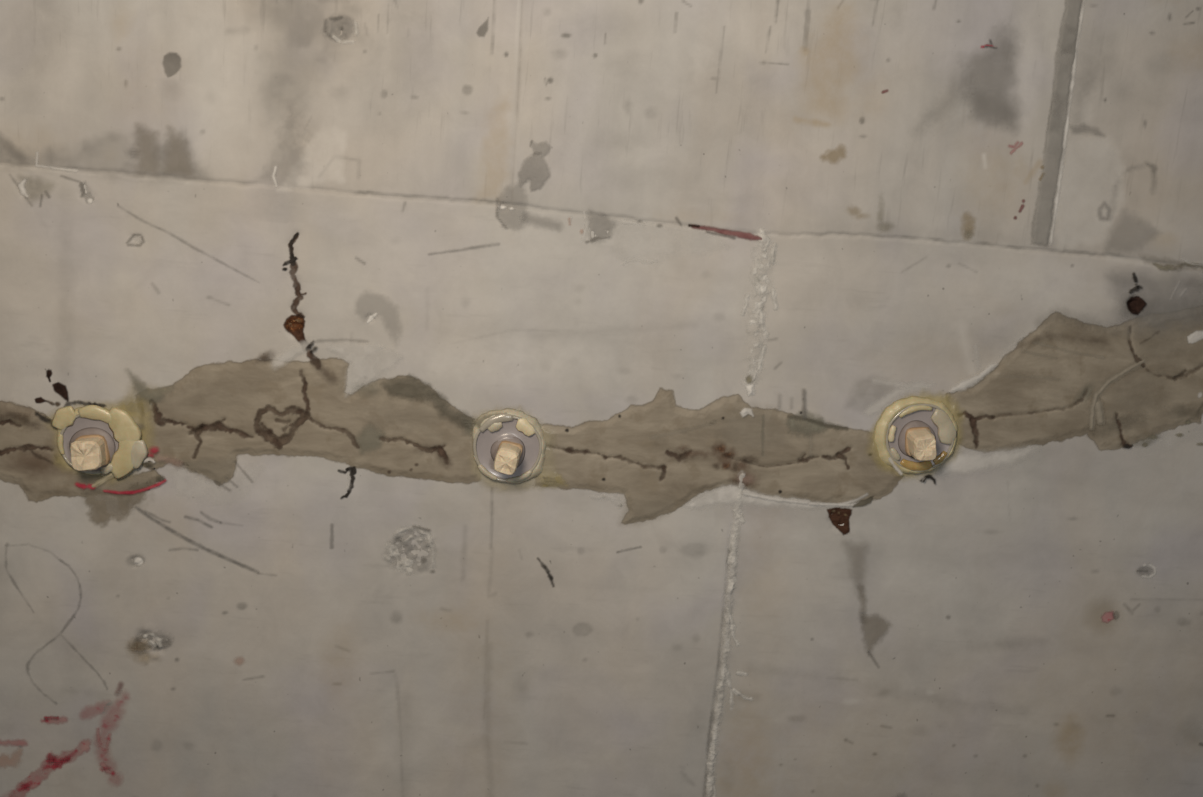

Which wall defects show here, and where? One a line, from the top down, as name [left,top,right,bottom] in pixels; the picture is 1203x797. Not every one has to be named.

crack [151,232,448,499]
crack [1129,340,1144,366]
crack [0,401,105,460]
crack [958,411,994,447]
crack [1117,420,1132,448]
crack [547,429,691,480]
crack [800,447,872,469]